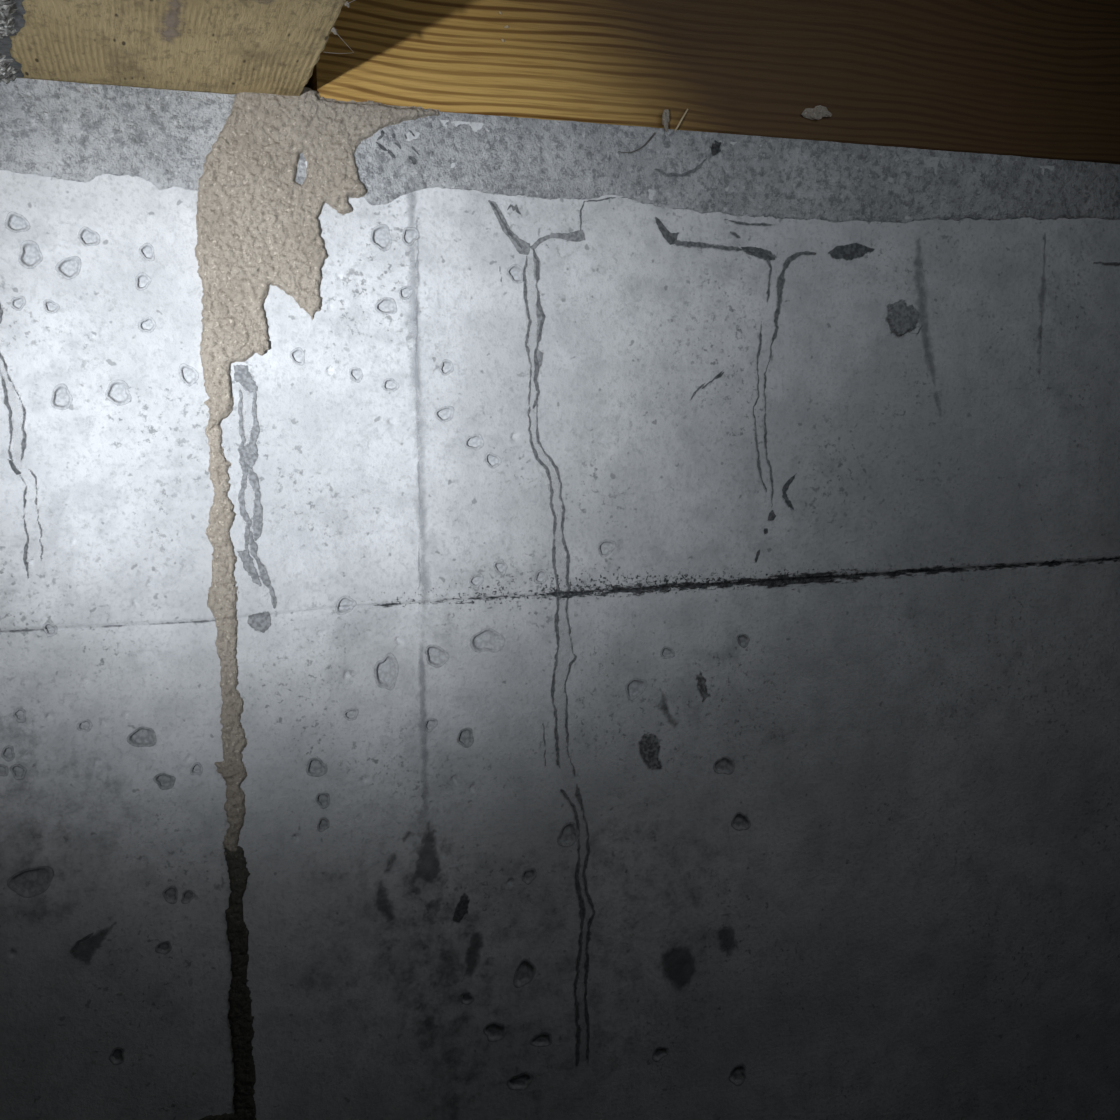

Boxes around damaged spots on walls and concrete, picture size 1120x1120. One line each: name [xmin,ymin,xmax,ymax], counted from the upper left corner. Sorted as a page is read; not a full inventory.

leakage [410,260,419,386]
crack [0,354,43,577]
crack [349,197,1120,1066]
leakage [200,846,256,1120]